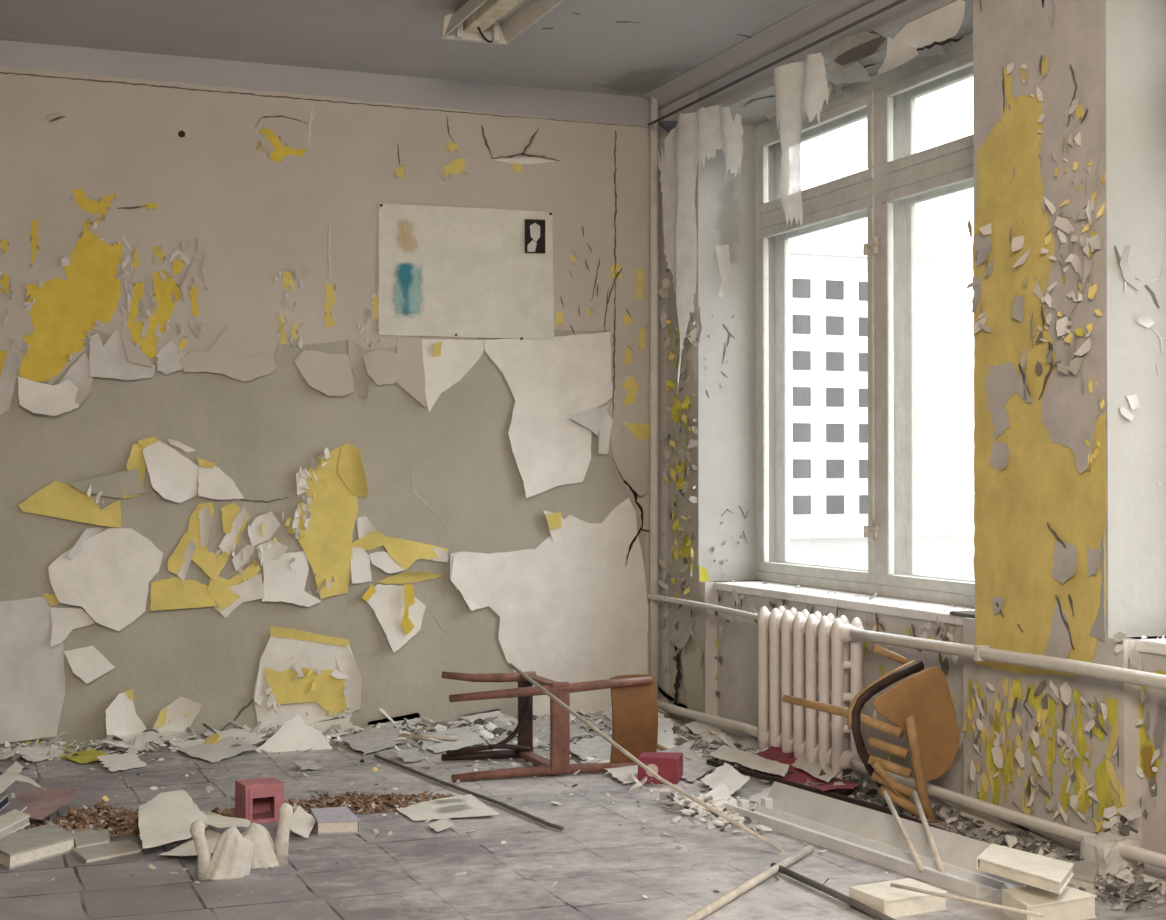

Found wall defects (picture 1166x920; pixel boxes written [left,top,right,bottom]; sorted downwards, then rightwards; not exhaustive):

peeling [825,0,965,99]
peeling [255,103,316,163]
peeling [442,116,469,181]
crack [0,72,649,418]
peeling [928,55,1166,845]
peeling [0,189,789,816]
crack [624,480,650,564]
peeling [863,612,893,675]
peeling [906,615,959,679]